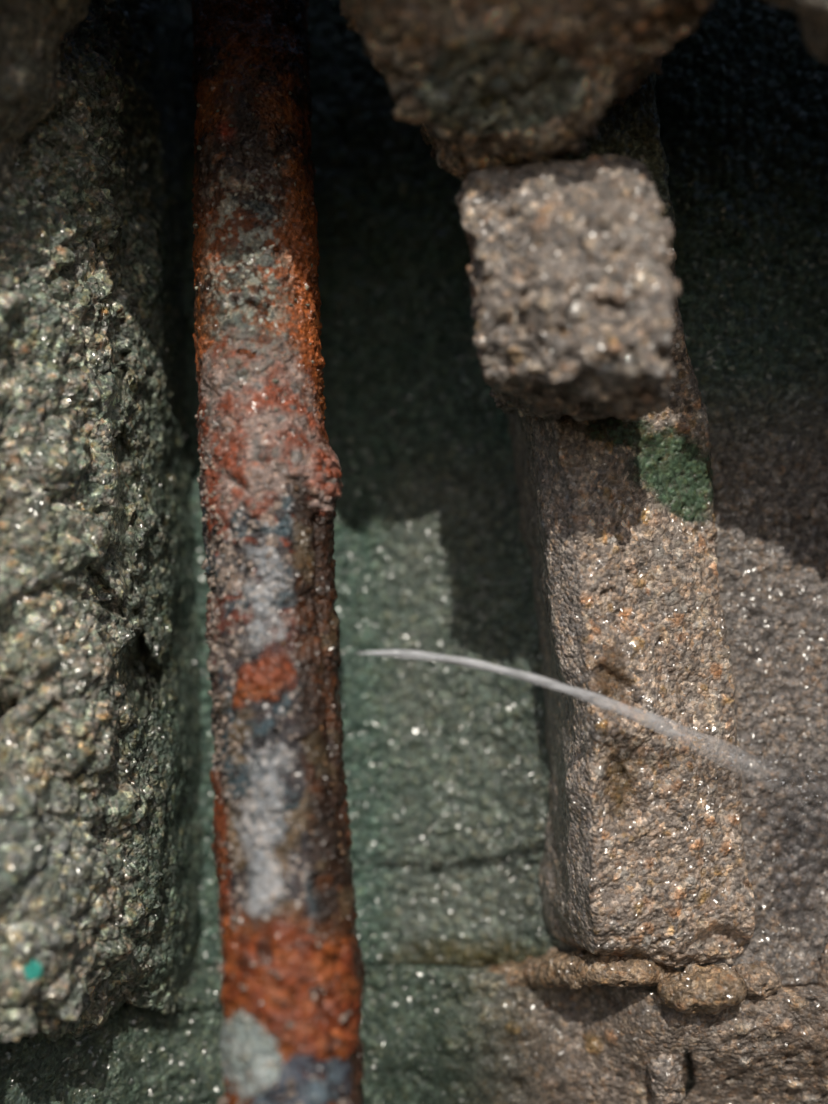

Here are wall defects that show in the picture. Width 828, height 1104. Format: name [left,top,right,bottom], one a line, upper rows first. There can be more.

spalling [0,200,159,1011]
spalling [339,0,756,968]